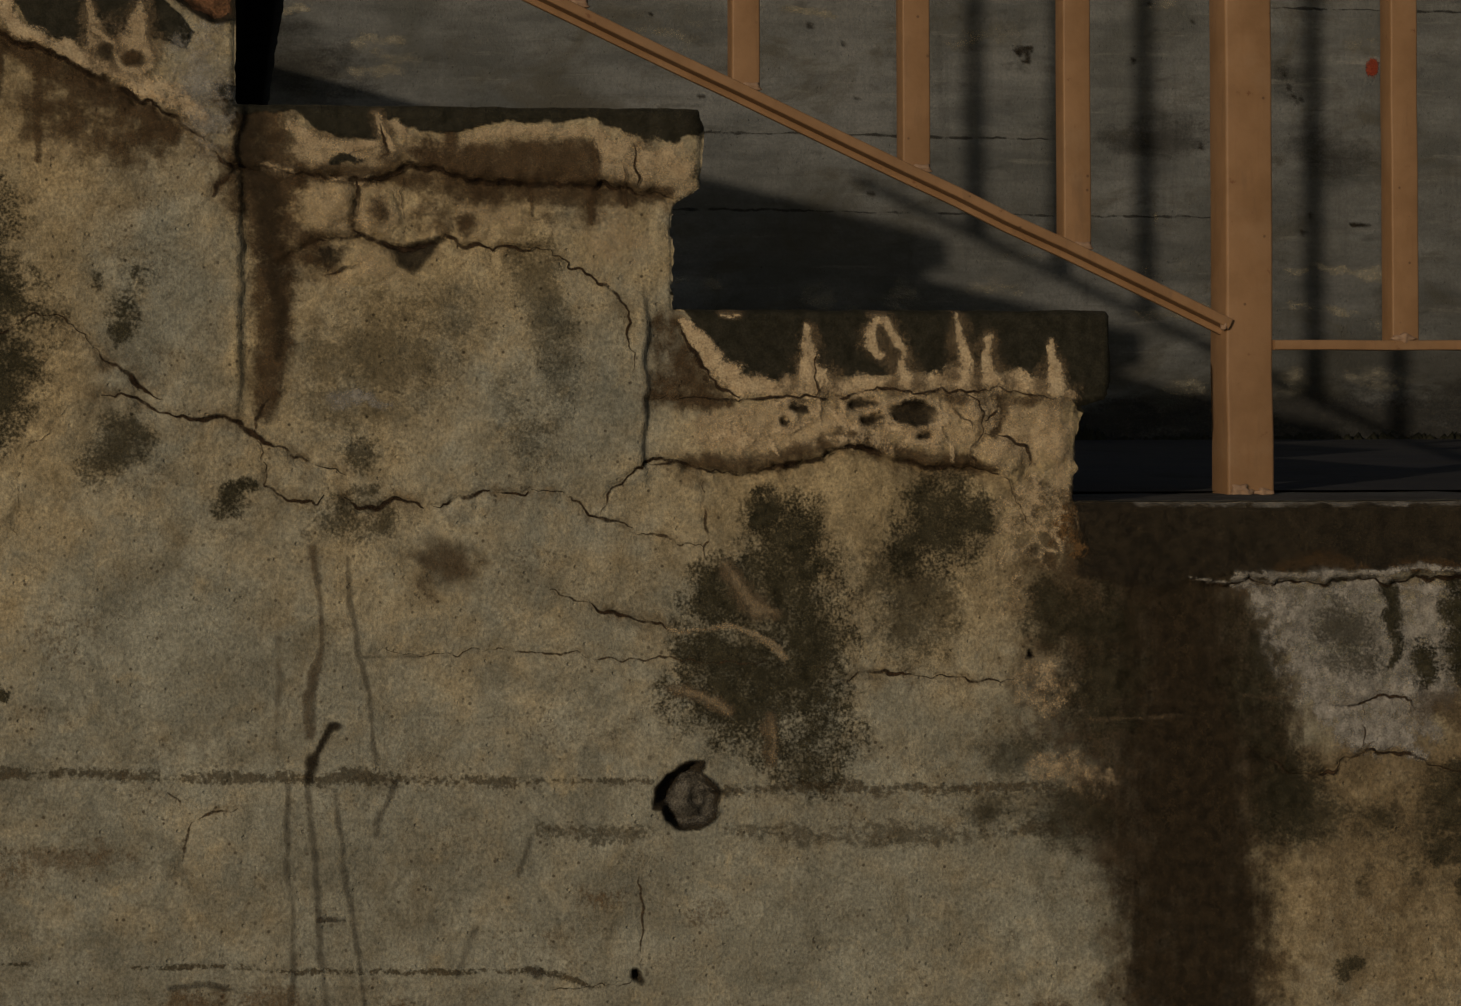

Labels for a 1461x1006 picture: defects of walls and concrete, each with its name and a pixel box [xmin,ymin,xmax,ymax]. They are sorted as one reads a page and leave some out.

peeling [14,0,236,49]
peeling [214,82,705,180]
leakage [0,0,695,456]
crack [0,32,1062,563]
leakage [718,309,742,318]
peeling [670,291,1110,413]
spalling [781,401,812,429]
spalling [847,397,936,441]
leakage [644,311,1461,1006]
crack [1256,693,1461,776]